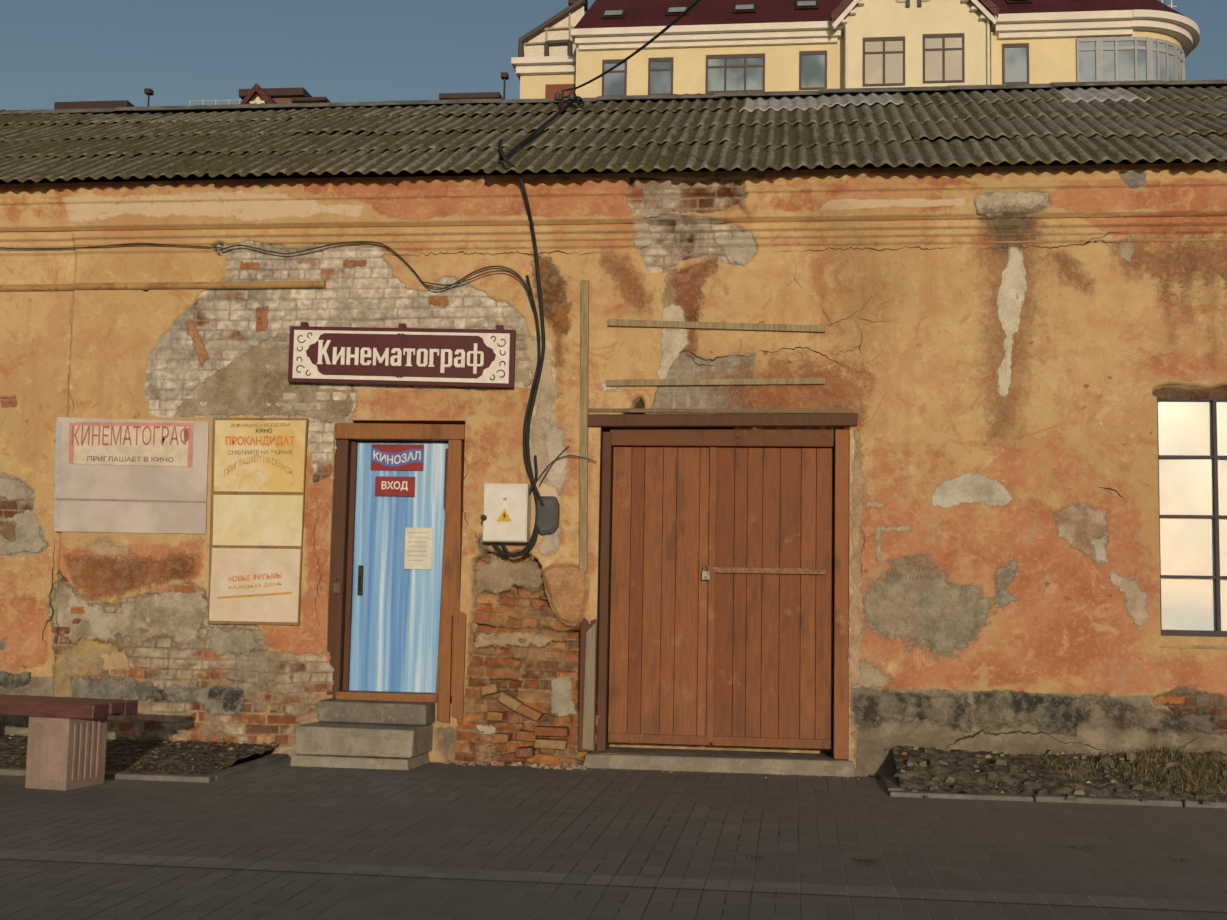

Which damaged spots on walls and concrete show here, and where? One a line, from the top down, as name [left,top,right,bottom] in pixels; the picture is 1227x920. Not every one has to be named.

spalling [144,240,568,494]
spalling [648,262,755,414]
peeling [996,242,1029,397]
peeling [0,715,30,727]
peeling [0,671,31,695]
spalling [0,473,48,557]
spalling [47,573,334,758]
spalling [453,527,600,765]
peeling [848,430,1227,737]